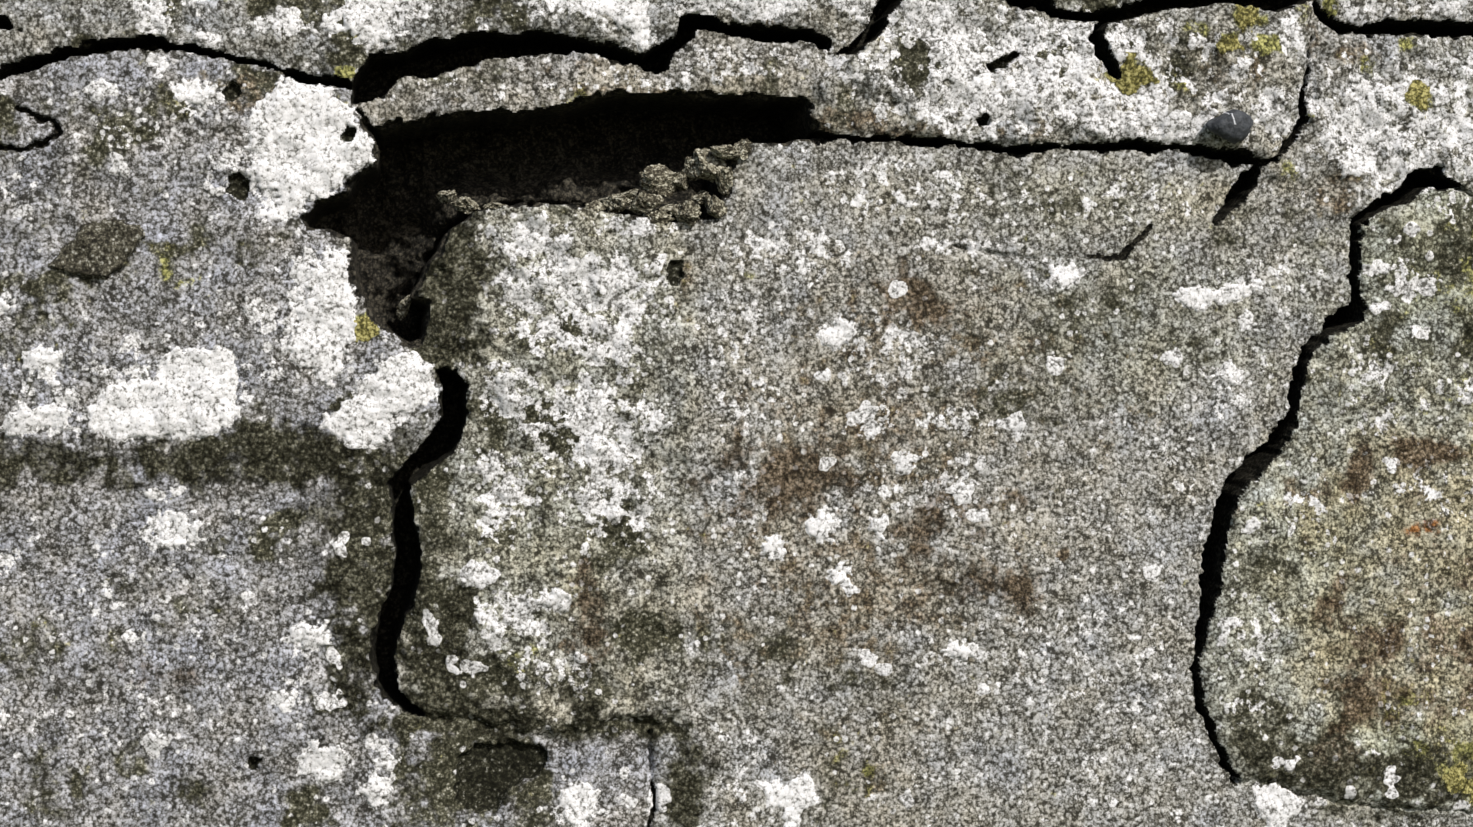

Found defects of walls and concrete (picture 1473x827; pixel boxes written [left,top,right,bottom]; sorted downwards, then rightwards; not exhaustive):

spalling [340,126,357,142]
crack [0,0,902,152]
crack [808,67,1310,226]
crack [1001,0,1473,80]
spalling [666,260,684,286]
crack [1086,224,1153,262]
crack [369,366,469,717]
crack [1189,165,1462,786]